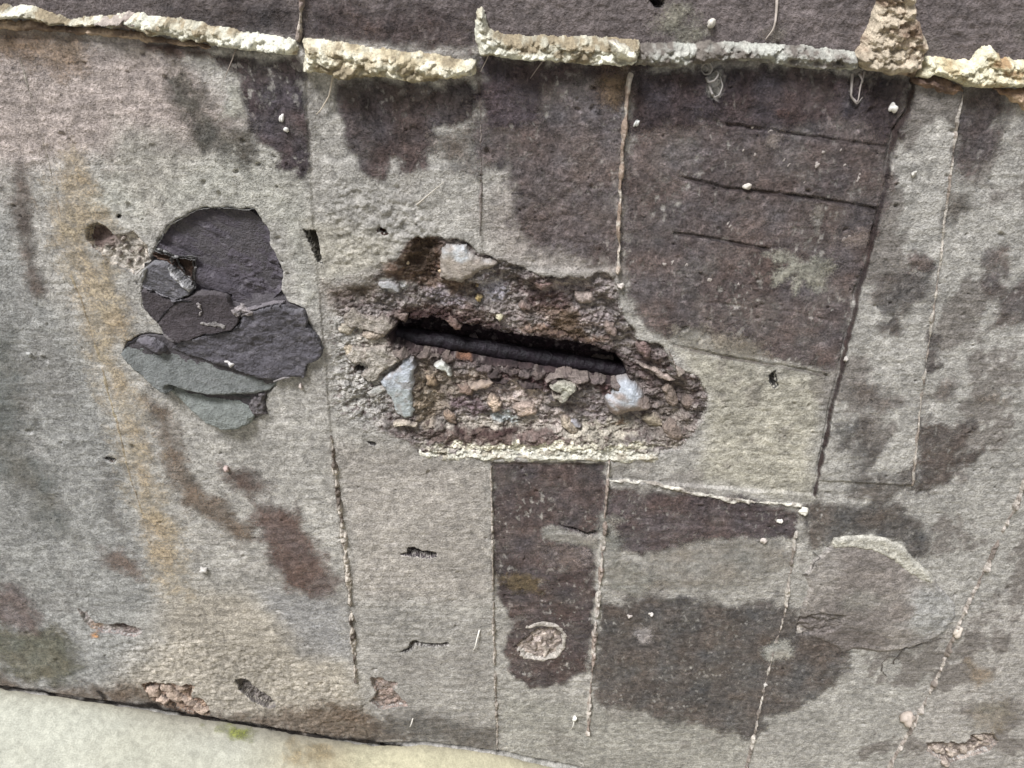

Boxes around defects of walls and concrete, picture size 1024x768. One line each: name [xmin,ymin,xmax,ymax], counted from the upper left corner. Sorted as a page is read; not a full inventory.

damp [217,0,290,36]
damp [144,43,311,179]
damp [302,0,909,372]
damp [873,253,935,336]
damp [981,247,1024,328]
spalling [86,223,708,463]
damp [925,331,942,374]
damp [922,379,957,405]
damp [147,402,337,598]
damp [490,419,985,741]
spalling [142,682,211,716]